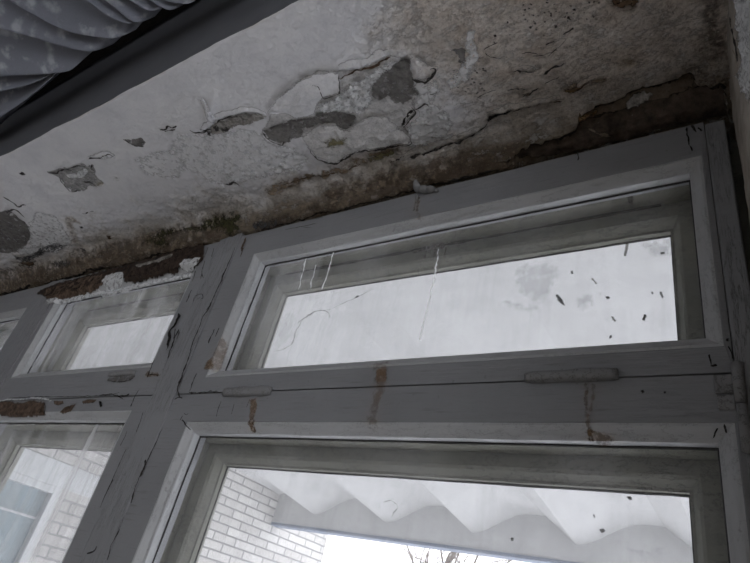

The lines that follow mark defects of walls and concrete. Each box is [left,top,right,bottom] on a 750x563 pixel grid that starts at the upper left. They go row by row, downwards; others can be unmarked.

damp [448,31,479,88]
peeling [200,49,438,165]
damp [408,82,452,147]
crack [390,28,600,163]
peeling [48,164,103,192]
damp [136,130,307,183]
peeling [0,197,44,266]
damp [29,213,71,253]
mould [146,212,240,245]
peeling [37,243,204,305]
crack [166,169,500,430]
peeling [0,392,119,418]